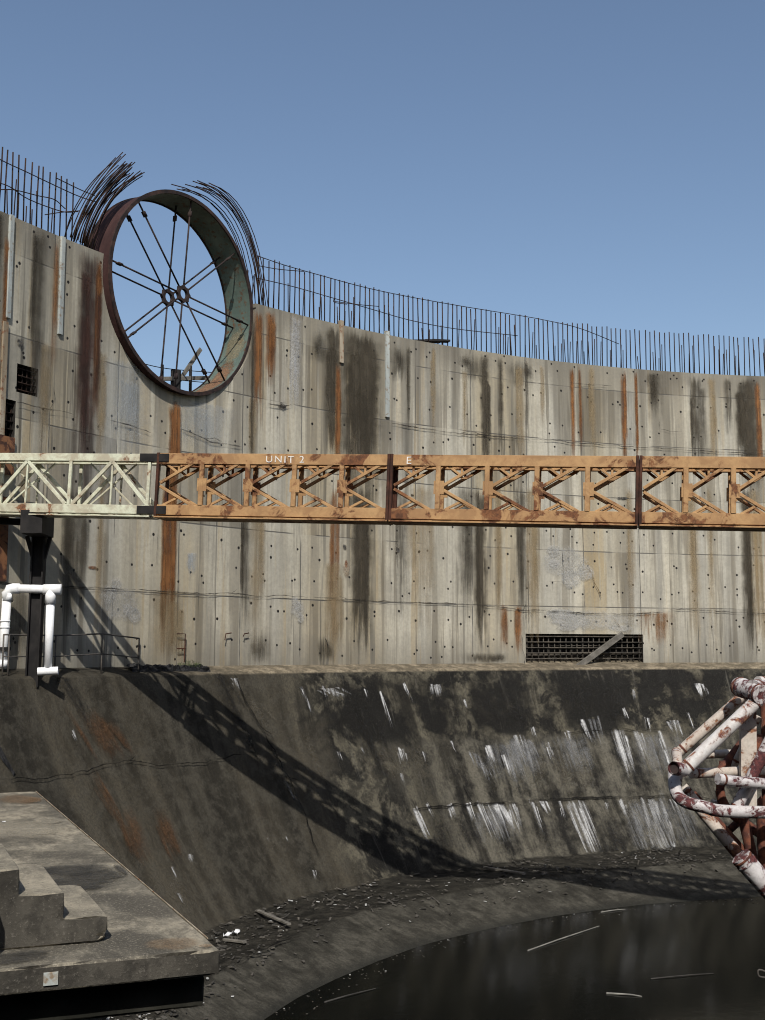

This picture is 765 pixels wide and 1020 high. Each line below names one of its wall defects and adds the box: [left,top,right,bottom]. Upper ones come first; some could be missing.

corrosion [254,314,275,397]
corrosion [169,404,181,453]
damp [467,358,503,455]
corrosion [570,370,582,449]
corrosion [621,377,639,456]
damp [726,381,758,457]
corrosion [161,520,176,634]
damp [353,524,371,625]
damp [465,526,499,638]
crack [14,754,241,780]
crack [412,788,665,810]
damp [615,718,682,765]